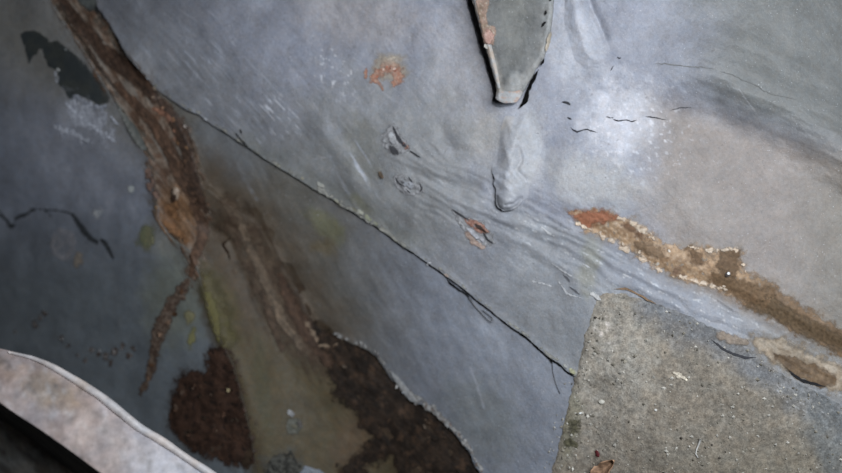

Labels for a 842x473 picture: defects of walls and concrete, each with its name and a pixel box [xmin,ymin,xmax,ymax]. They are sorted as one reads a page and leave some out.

rust [476,0,496,49]
peeling [21,30,119,146]
spalling [381,124,421,158]
crack [562,101,692,133]
crack [0,208,114,259]
rust [51,0,480,473]
crack [161,93,575,377]
spalling [452,210,495,248]
crack [711,339,754,359]
peeling [332,333,483,472]